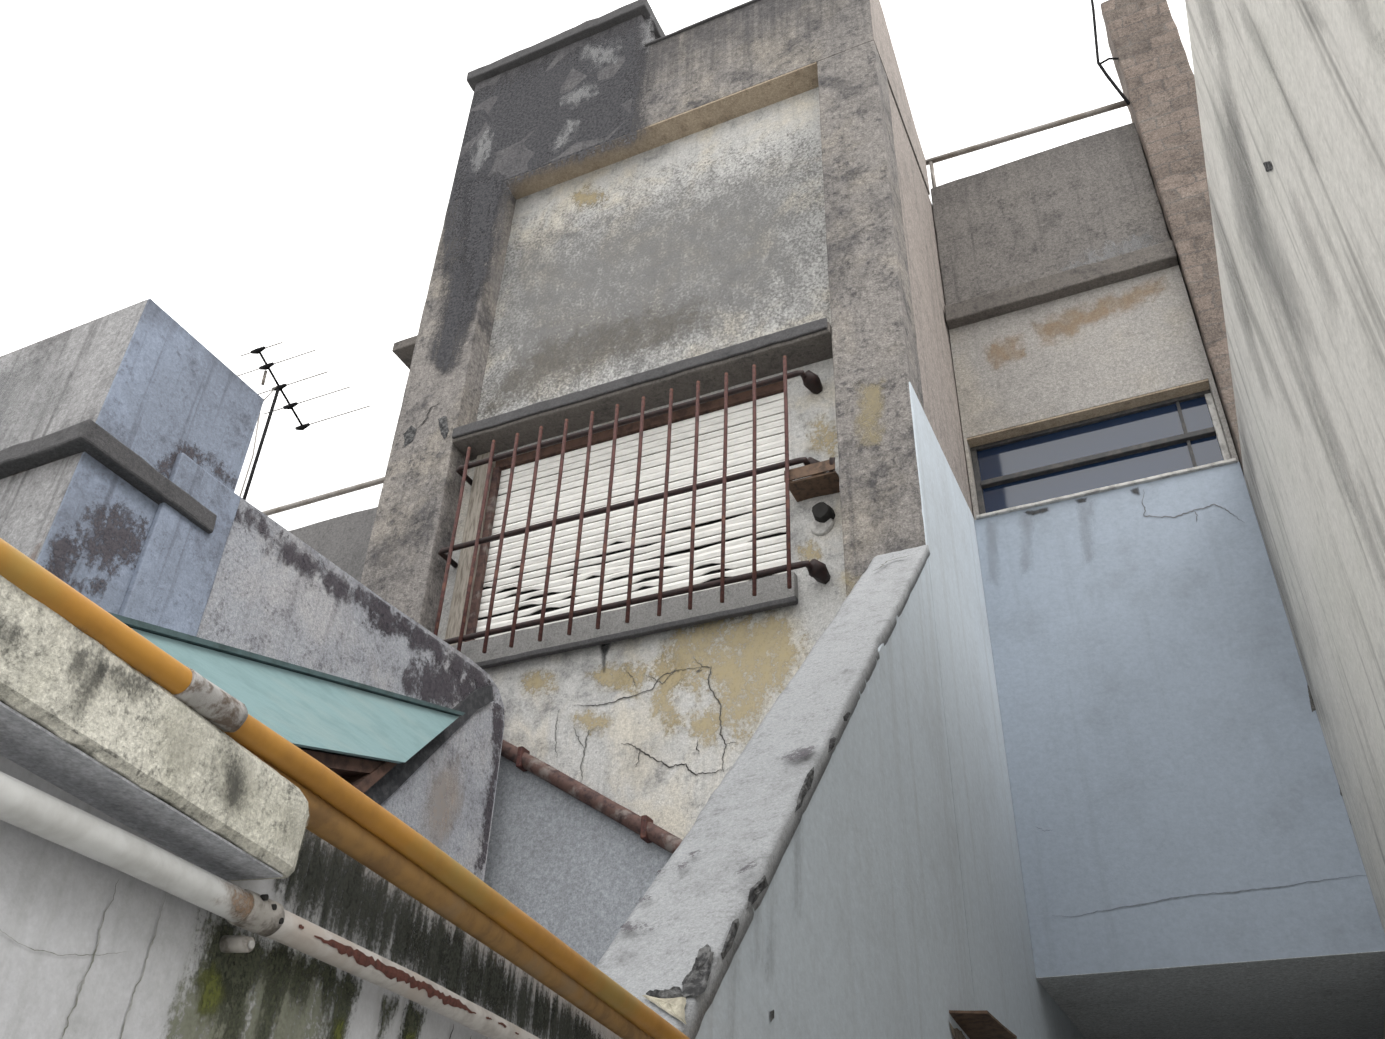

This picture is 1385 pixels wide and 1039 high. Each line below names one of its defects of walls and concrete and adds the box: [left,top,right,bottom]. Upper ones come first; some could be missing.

water stain [430,20,831,420]
water stain [44,503,149,599]
water stain [235,507,491,708]
crack [1142,489,1245,523]
water stain [474,703,506,874]
crack [555,656,736,782]
flaking render [795,767,814,812]
crack [0,880,167,1039]
water stain [195,918,362,1039]
water stain [275,828,601,1039]
spalling [642,875,768,1024]
crack [1064,875,1367,917]